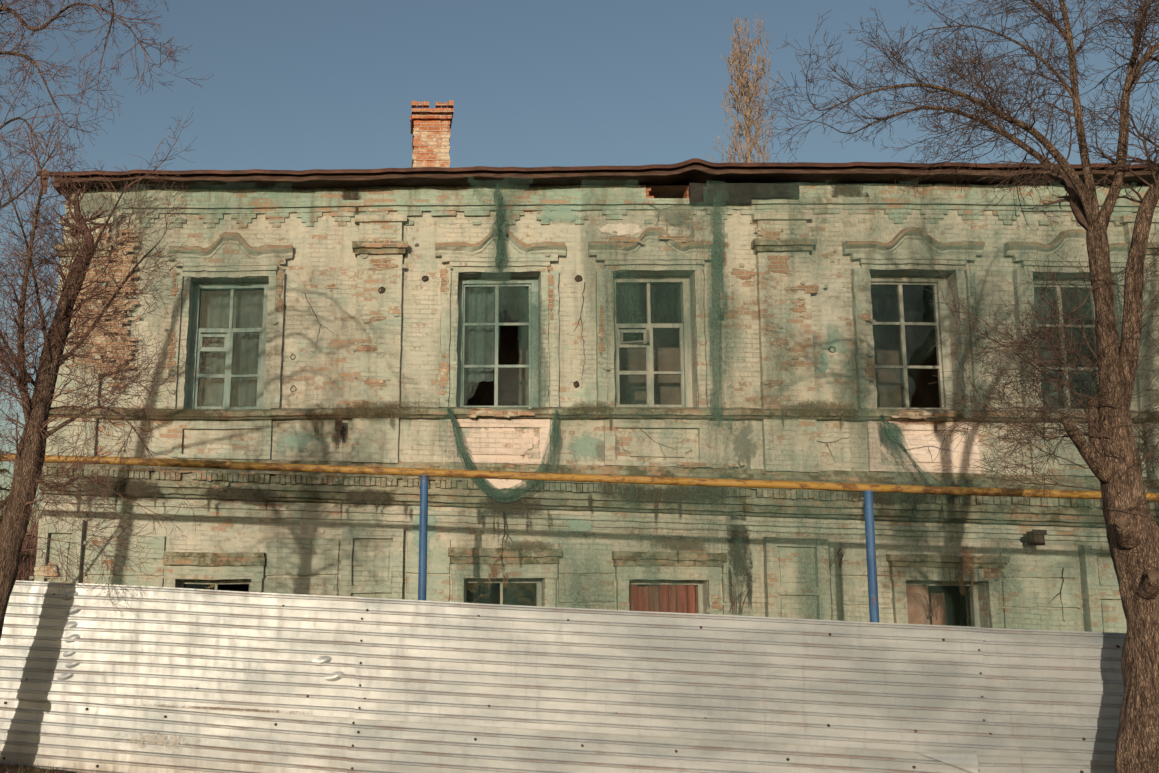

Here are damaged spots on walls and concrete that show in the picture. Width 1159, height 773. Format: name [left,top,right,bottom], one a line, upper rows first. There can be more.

spalling [66,225,163,391]
spalling [360,237,415,270]
spalling [602,230,641,242]
spalling [716,232,828,317]